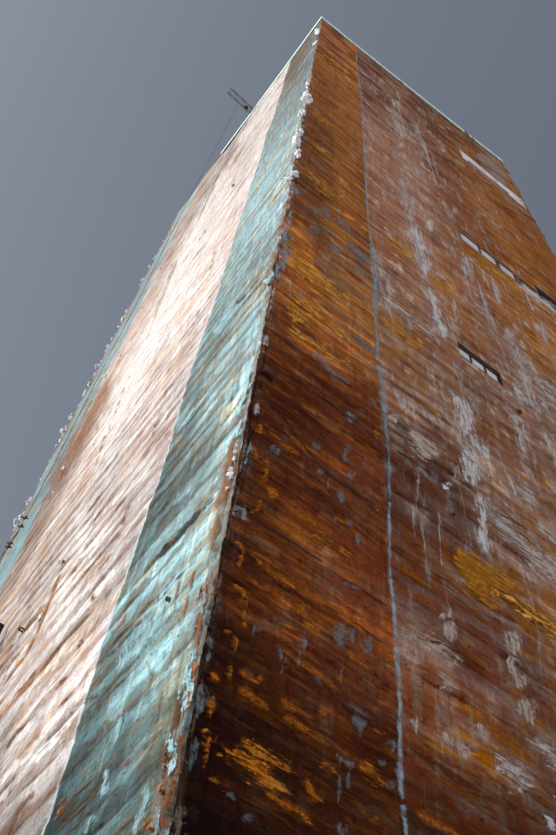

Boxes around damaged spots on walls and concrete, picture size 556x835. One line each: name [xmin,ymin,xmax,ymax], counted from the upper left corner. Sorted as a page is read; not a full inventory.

rust [287,290,350,365]
water stain [382,289,450,337]
water stain [478,282,556,410]
water stain [410,429,441,459]
water stain [453,396,490,485]
water stain [474,494,556,581]
rust [16,575,59,666]
rust [453,549,556,641]
peeling [178,649,210,721]
peeling [162,731,177,776]
peeling [171,805,187,835]
rust [217,739,323,825]